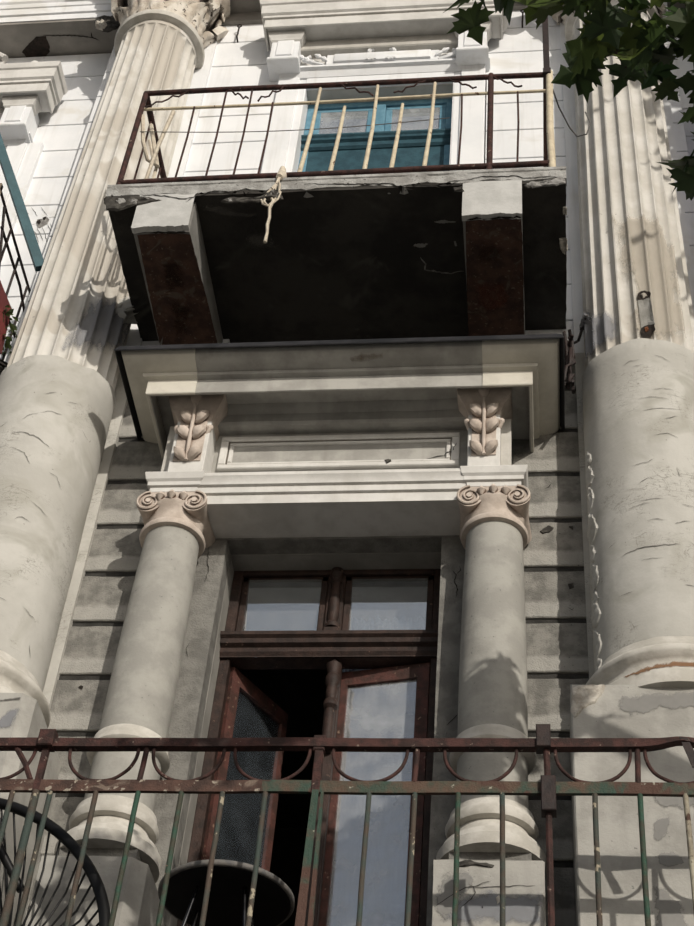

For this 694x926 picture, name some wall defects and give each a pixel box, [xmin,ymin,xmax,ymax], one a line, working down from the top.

spalling [22,36,50,57]
crack [437,881,535,907]